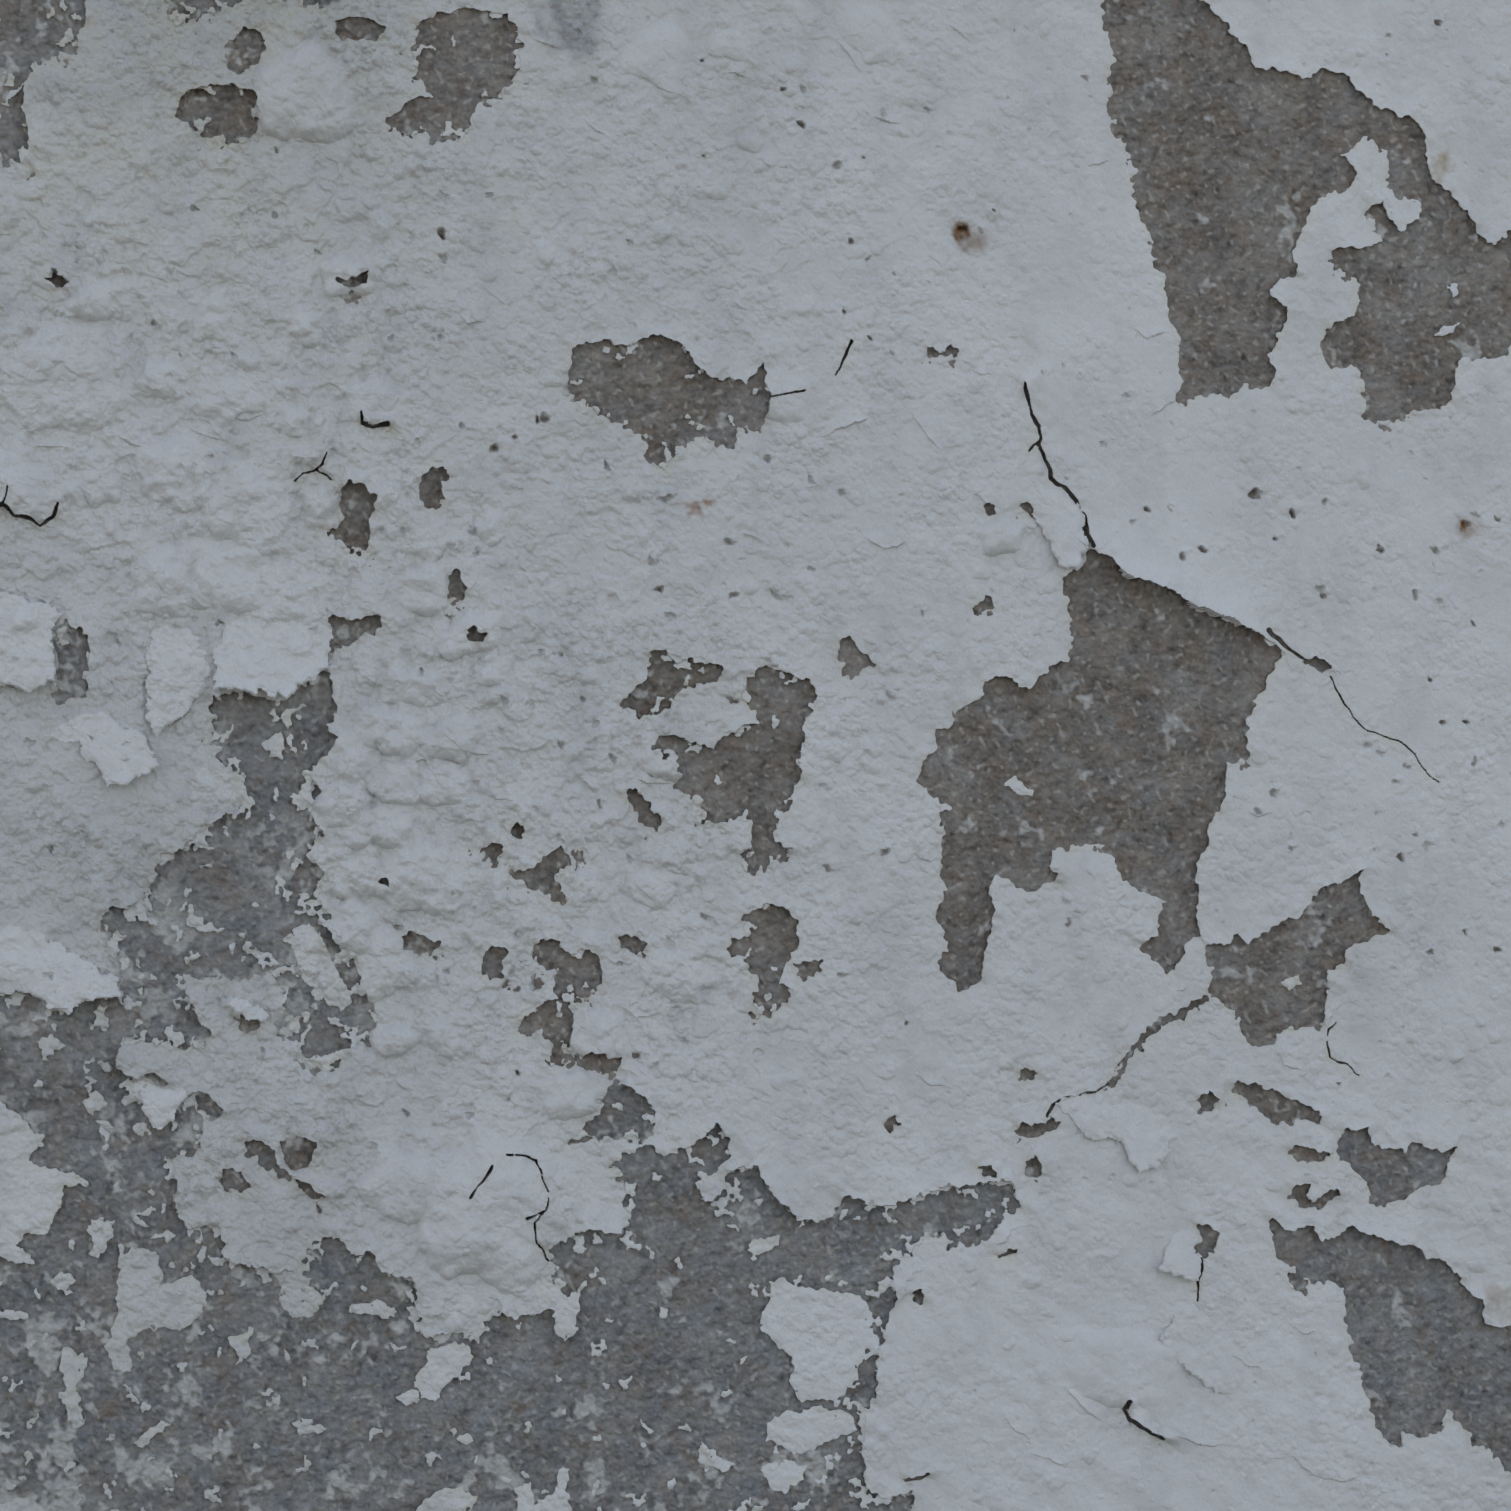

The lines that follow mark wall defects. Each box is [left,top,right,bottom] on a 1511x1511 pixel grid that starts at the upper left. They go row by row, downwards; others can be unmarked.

peeling [0,0,99,180]
peeling [157,0,275,151]
spalling [283,0,397,42]
peeling [385,0,532,145]
peeling [1100,0,1511,432]
peeling [562,326,775,468]
crack [1023,382,1096,552]
peeling [916,483,1401,1047]
crack [1263,627,1439,783]
peeling [0,592,1177,1511]
peeling [1193,1072,1511,1473]